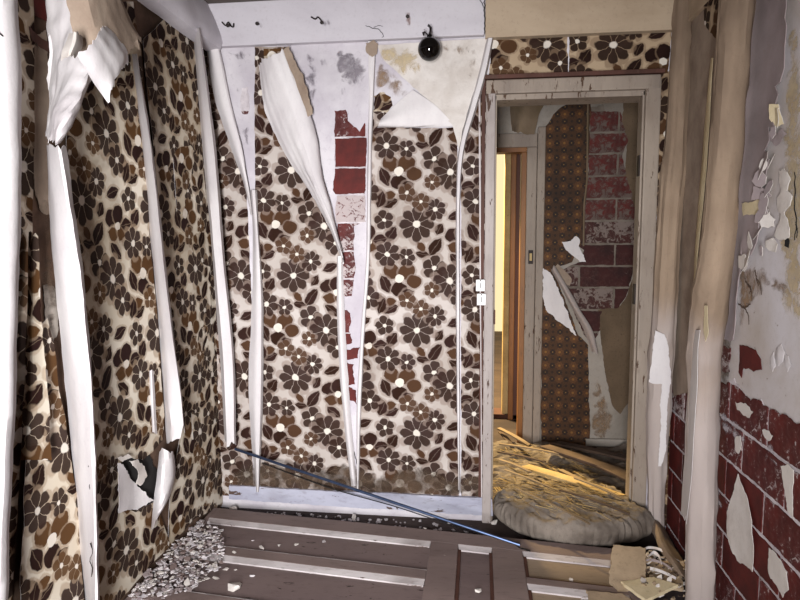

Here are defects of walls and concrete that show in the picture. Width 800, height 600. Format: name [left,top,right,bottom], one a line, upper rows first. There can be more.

water stain [337,52,363,82]
flaking render [43,284,59,341]
flaking render [333,110,367,297]
flaking render [345,310,360,404]
flaking render [564,104,635,340]
flaking render [715,0,800,600]
flaking render [666,382,688,560]